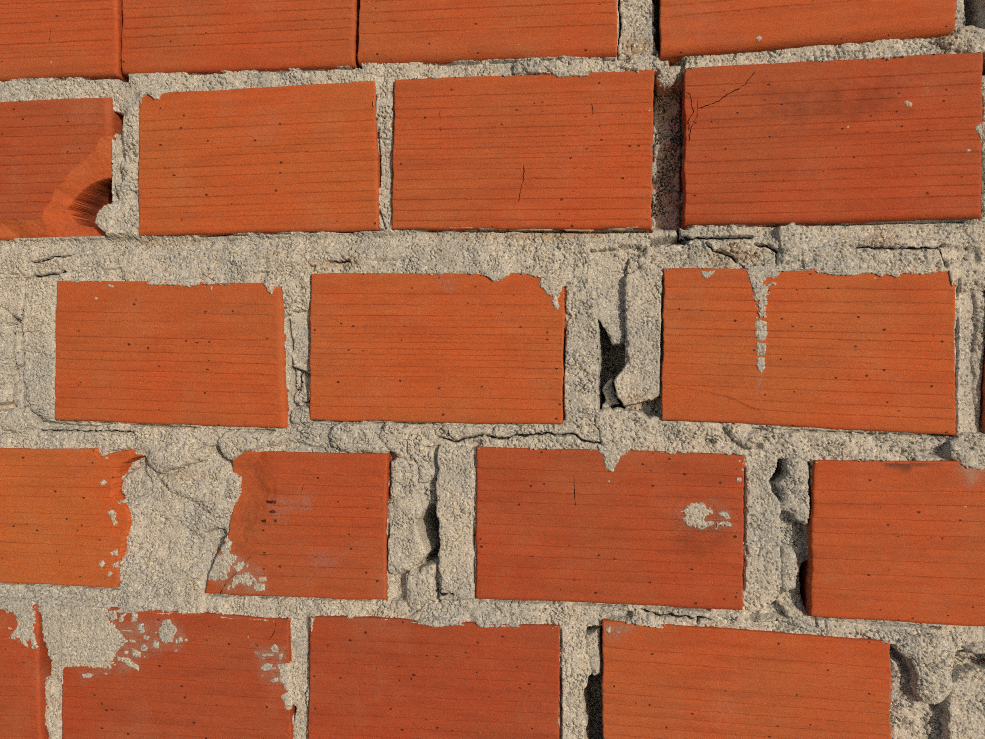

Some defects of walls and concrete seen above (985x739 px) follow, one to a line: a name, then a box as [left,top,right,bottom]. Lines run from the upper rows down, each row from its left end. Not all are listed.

crack [686,72,755,141]
spalling [0,134,115,241]
crack [677,229,777,262]
crack [855,246,945,267]
peeling [227,561,267,591]